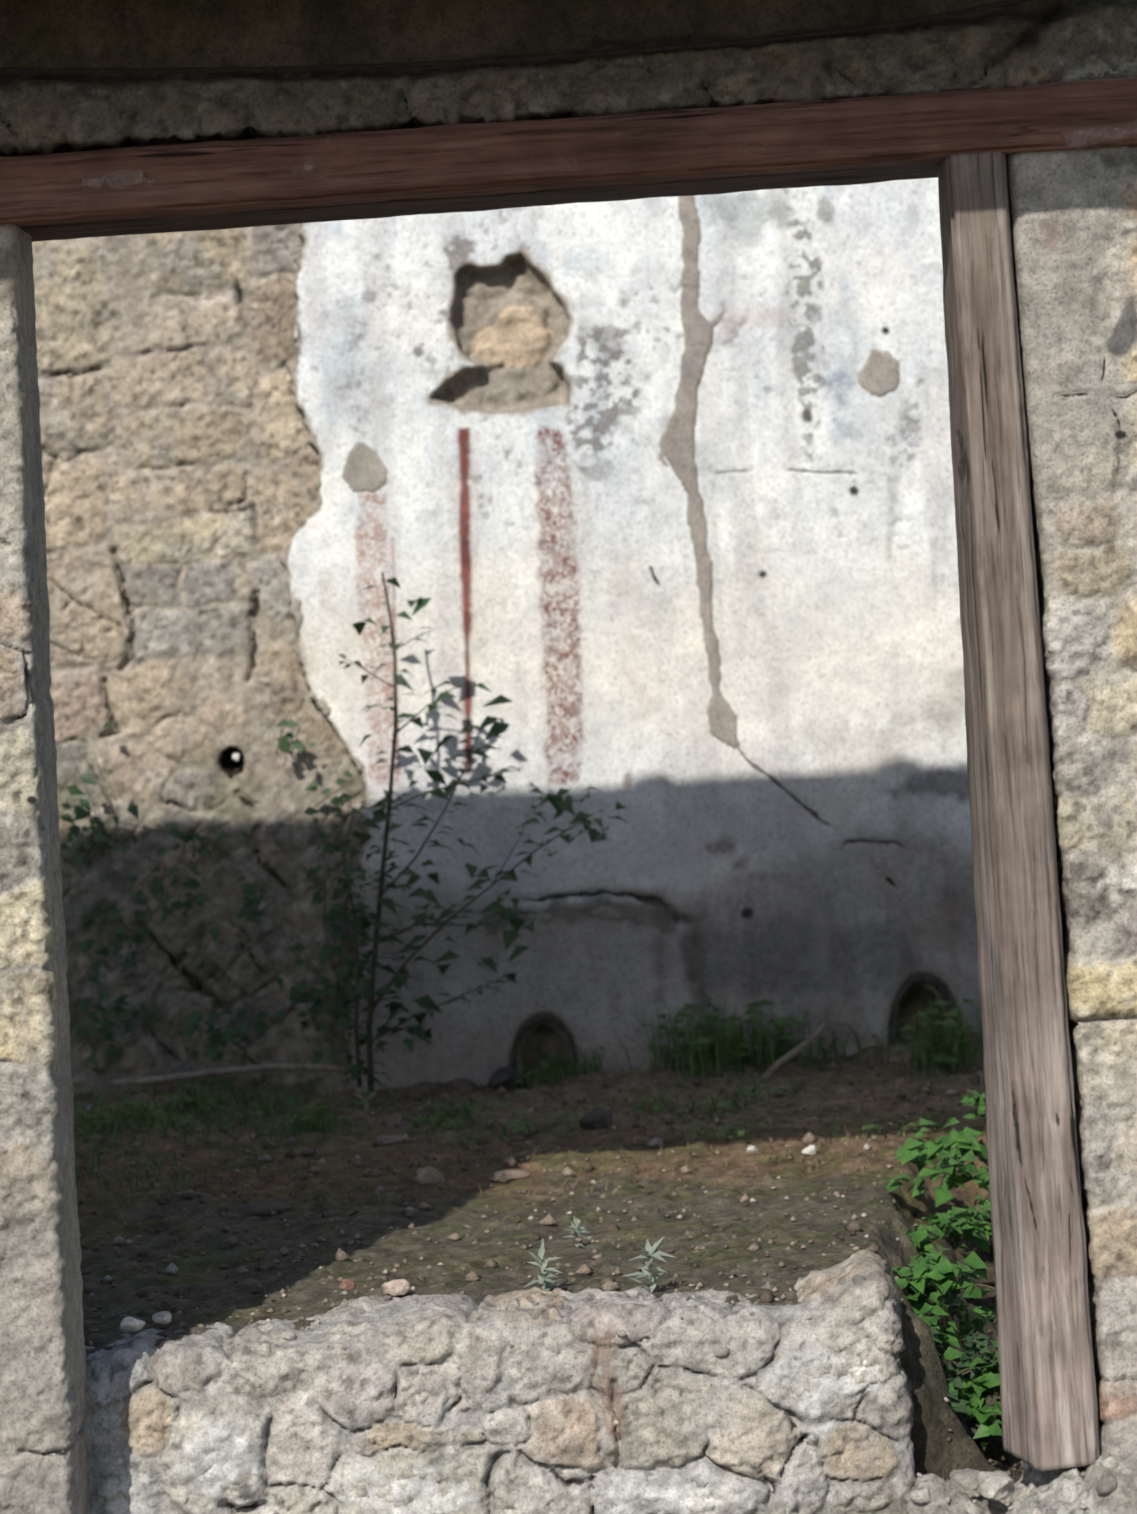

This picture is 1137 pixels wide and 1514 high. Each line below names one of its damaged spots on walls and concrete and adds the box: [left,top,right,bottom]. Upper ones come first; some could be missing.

flaking render [282,239,363,768]
spalling [342,406,388,493]
spalling [435,236,638,468]
crack [658,195,903,886]
crack [525,890,677,920]